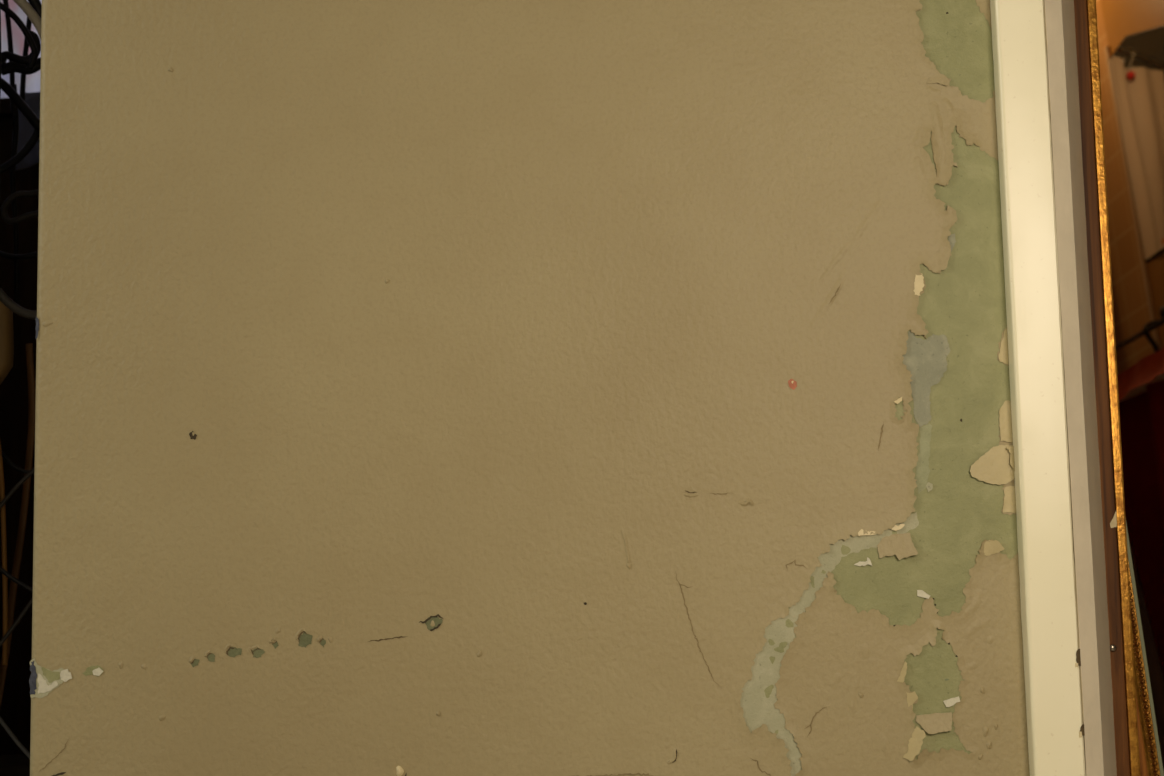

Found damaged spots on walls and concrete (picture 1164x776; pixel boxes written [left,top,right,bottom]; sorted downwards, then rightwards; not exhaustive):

peeling [728,0,1019,776]
peeling [420,614,443,631]
spalling [29,658,104,698]